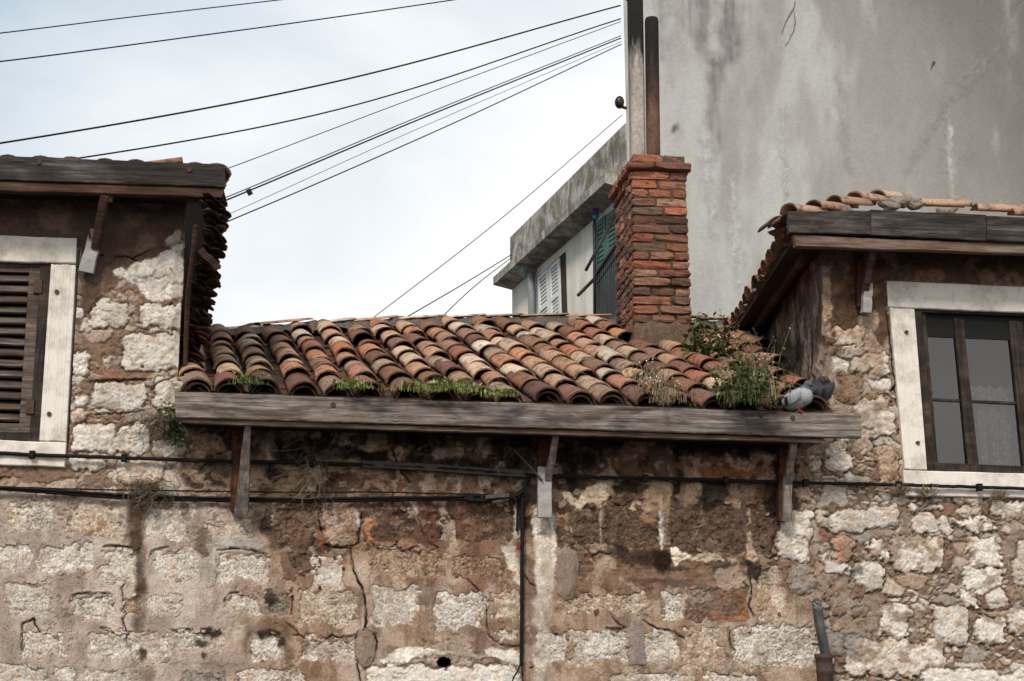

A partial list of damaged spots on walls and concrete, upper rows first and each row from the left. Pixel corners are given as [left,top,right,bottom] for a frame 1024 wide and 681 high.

flaking render [113,229,184,303]
damp [129,485,147,596]
crack [288,508,439,681]
spalling [535,470,820,681]